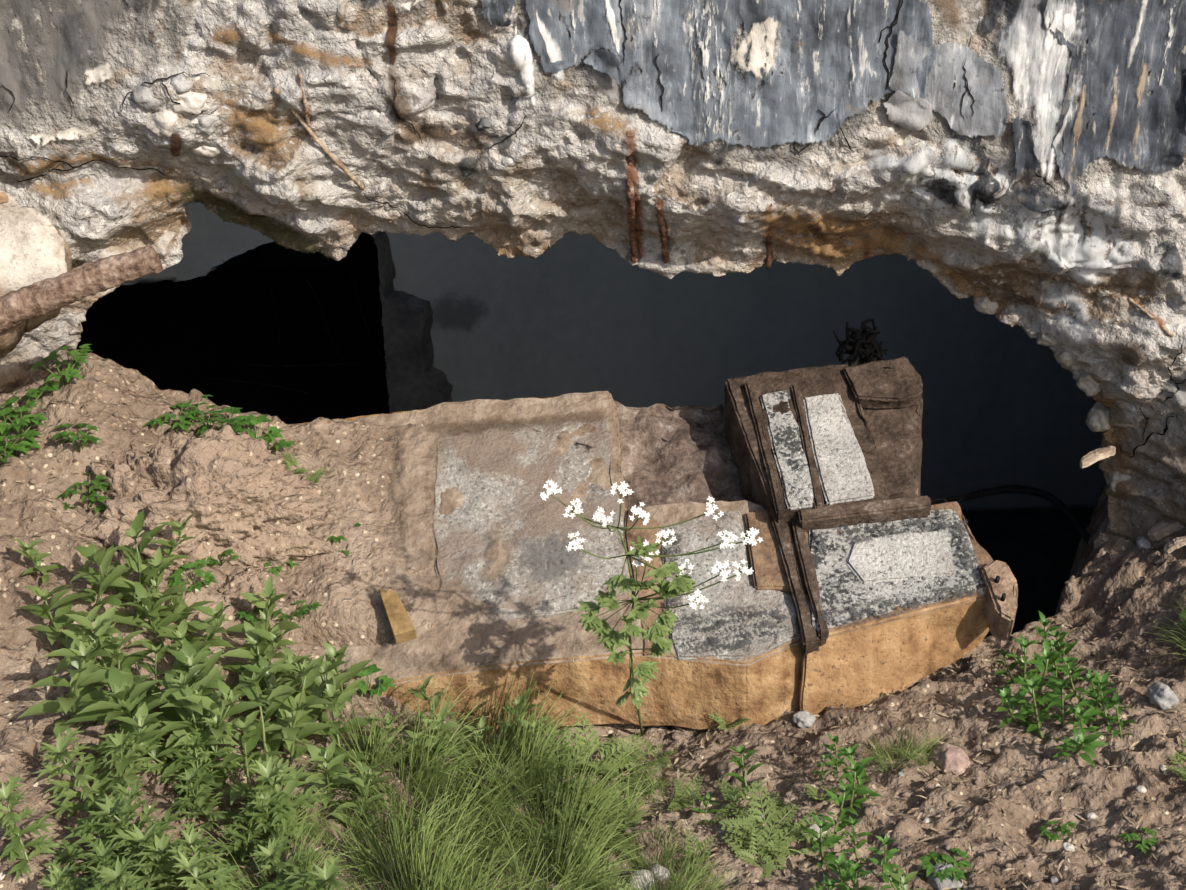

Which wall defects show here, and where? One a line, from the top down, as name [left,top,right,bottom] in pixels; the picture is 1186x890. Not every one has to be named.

crack [0,155,166,182]
crack [121,72,216,115]
rust [386,3,410,123]
crack [364,195,468,229]
crack [484,112,535,151]
rust [586,108,643,257]
spalling [626,155,638,263]
spalling [655,203,669,263]
peeling [481,0,1186,212]
rust [749,206,1005,309]
crack [878,0,903,101]
crack [1130,346,1186,457]